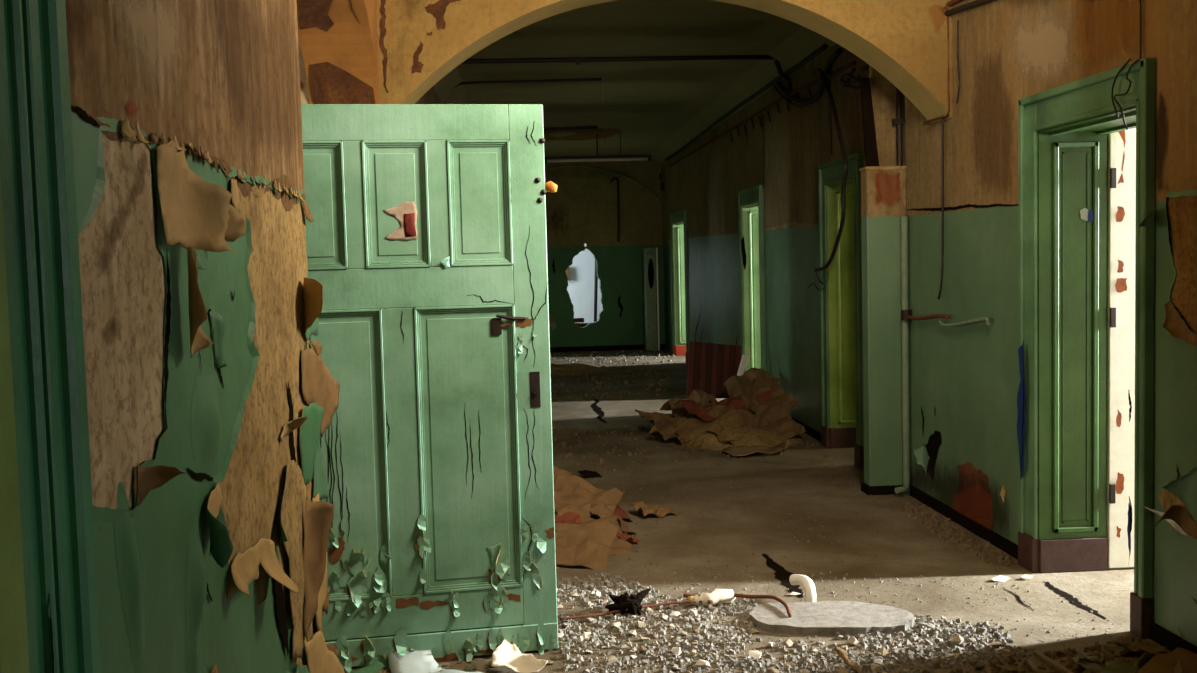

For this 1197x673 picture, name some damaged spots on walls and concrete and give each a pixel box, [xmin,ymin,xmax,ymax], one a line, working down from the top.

flaking render [411,0,460,73]
flaking render [310,62,375,104]
flaking render [1138,190,1197,346]
flaking render [71,102,414,673]
peeling [914,407,942,474]